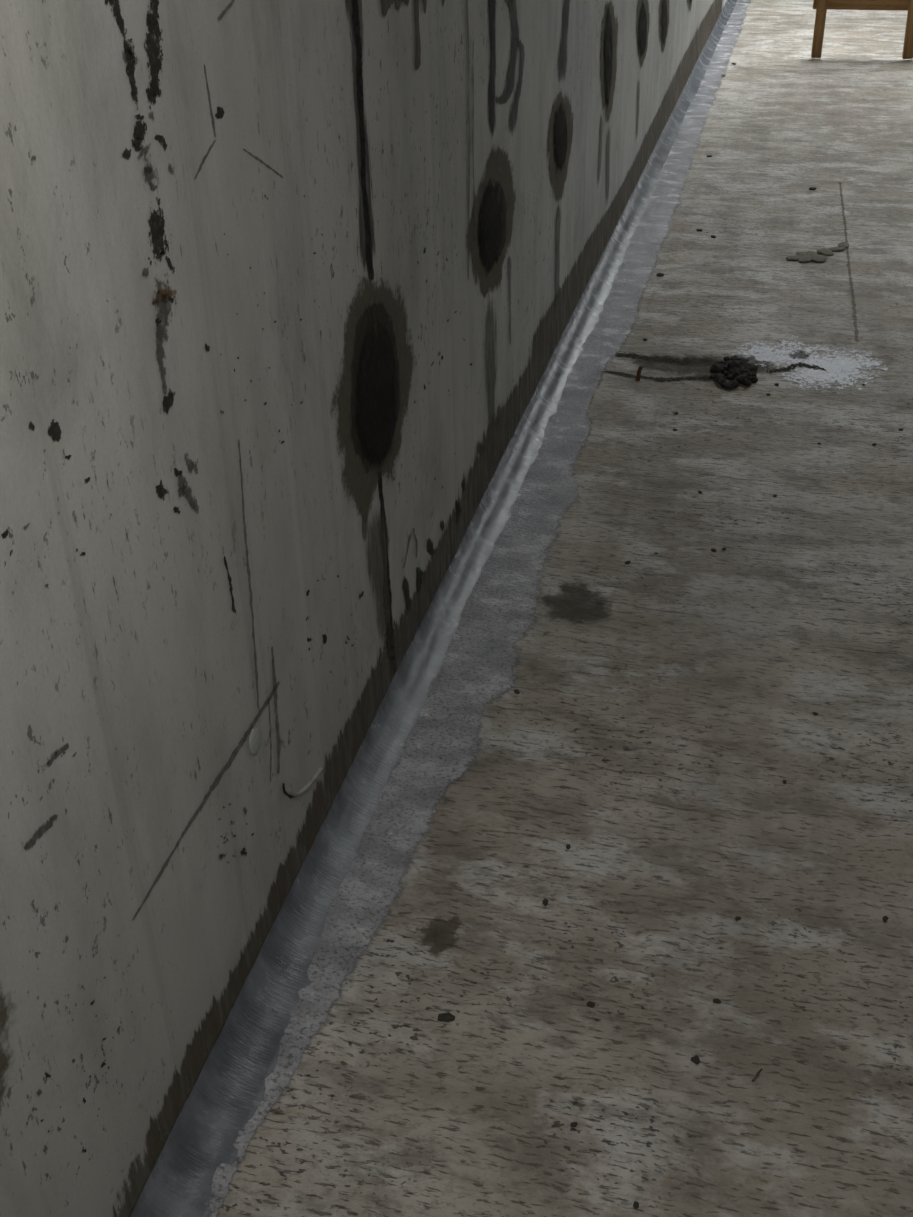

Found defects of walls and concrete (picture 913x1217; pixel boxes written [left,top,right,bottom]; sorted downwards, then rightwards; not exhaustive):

crack [345,0,375,281]
damp [728,334,888,394]
crack [362,470,394,660]
damp [113,0,723,1217]
damp [0,995,10,1100]